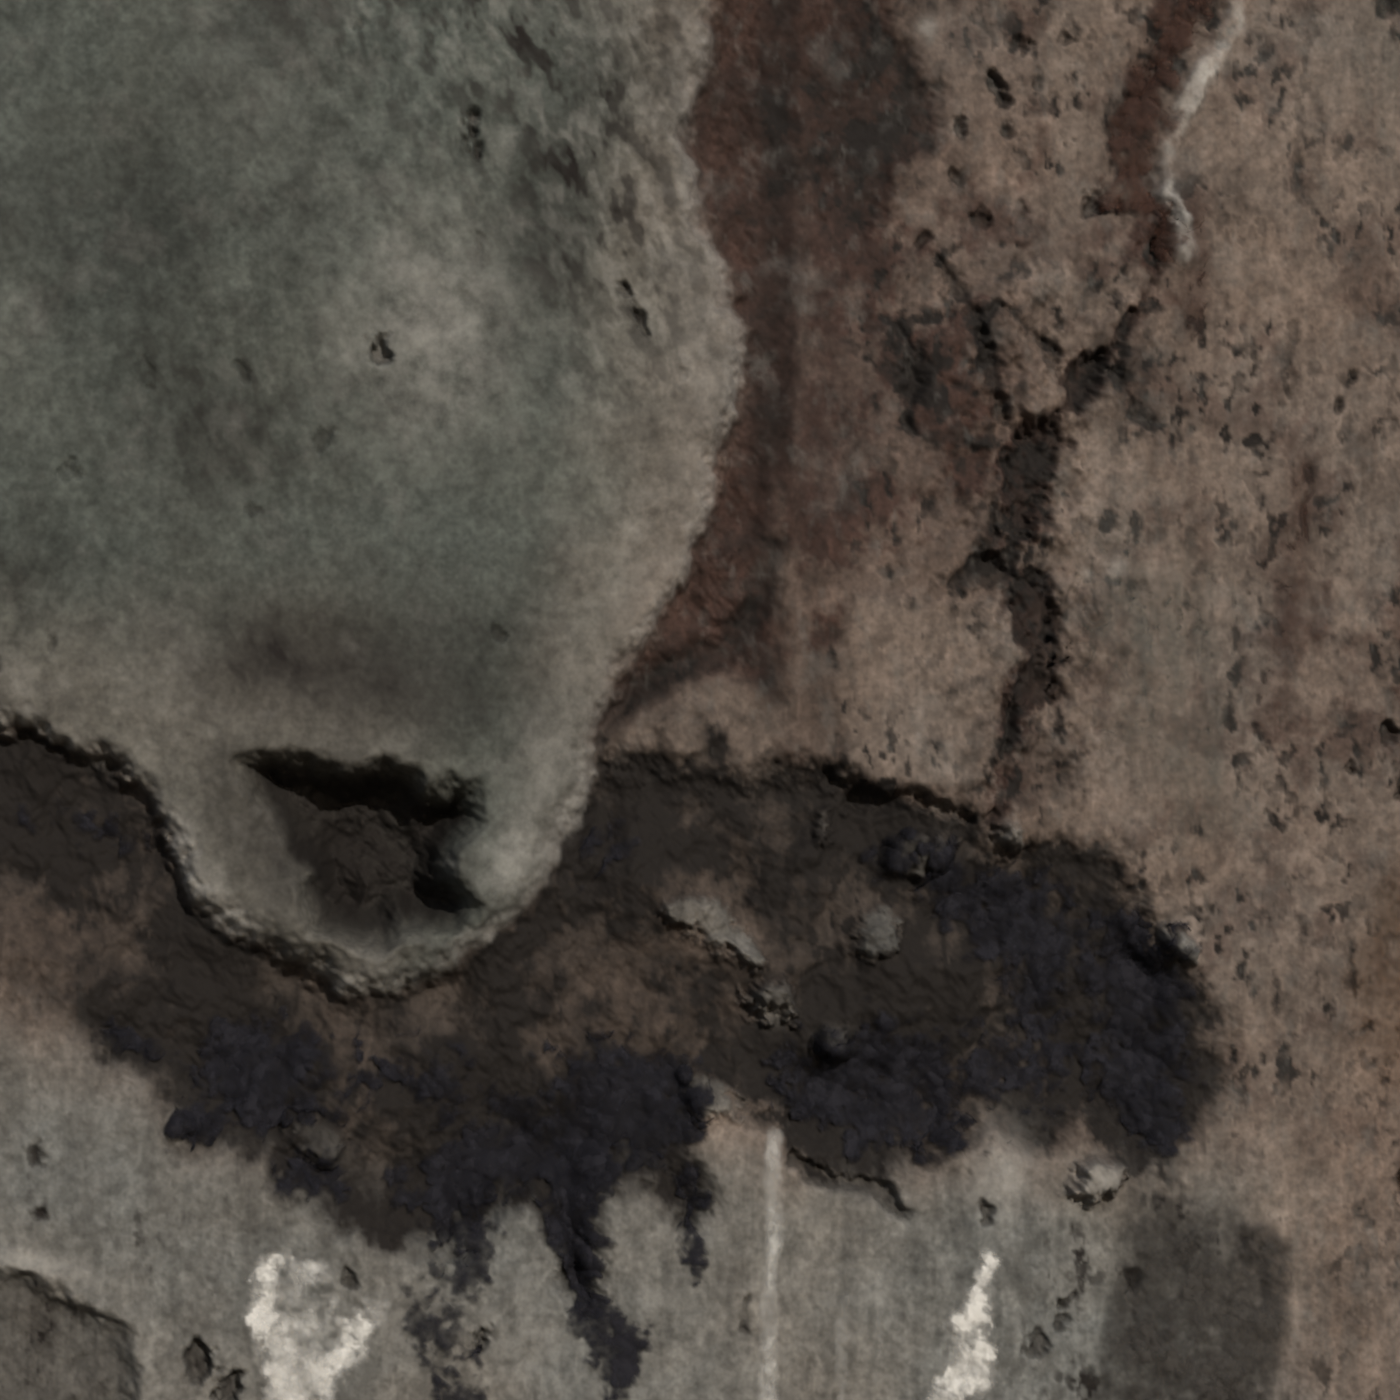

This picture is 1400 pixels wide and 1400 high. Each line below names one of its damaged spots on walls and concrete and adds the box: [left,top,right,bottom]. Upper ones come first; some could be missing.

spalling [987,70,1017,139]
spalling [1010,33,1037,57]
spalling [1081,0,1242,263]
spalling [597,0,968,727]
crack [892,322,928,438]
crack [932,208,1175,835]
spalling [0,695,1228,1303]
damp [763,827,1208,1164]
damp [165,1006,715,1400]
damp [935,1252,999,1400]
spalling [1021,1291,1078,1362]
damp [1099,1221,1289,1400]